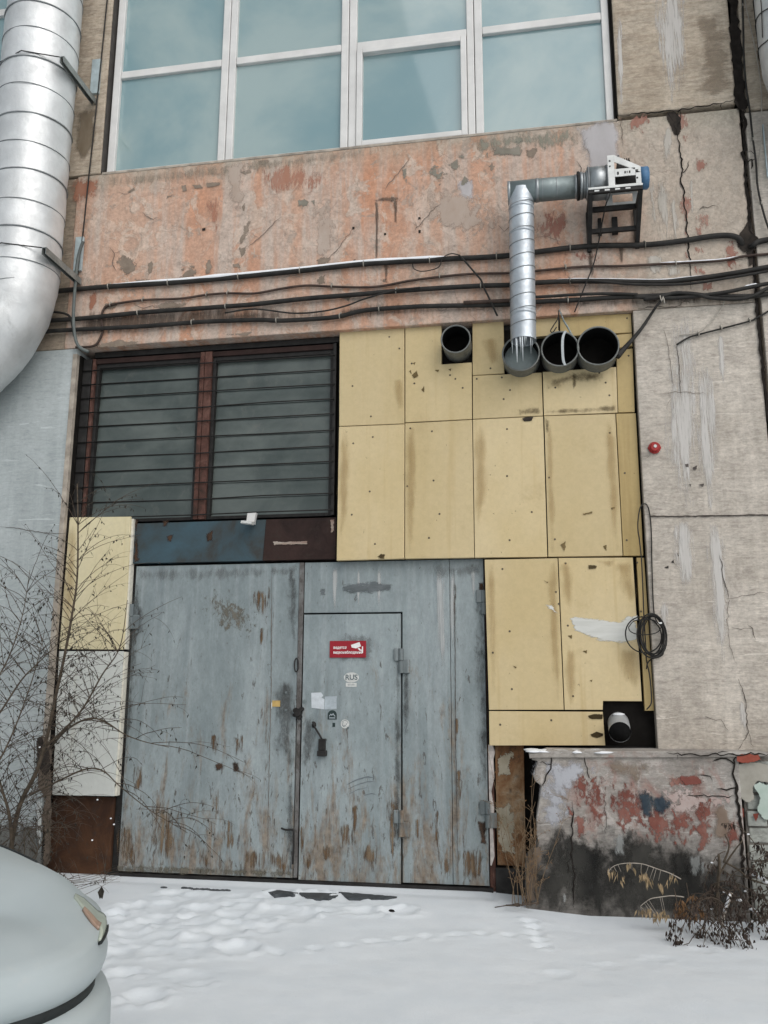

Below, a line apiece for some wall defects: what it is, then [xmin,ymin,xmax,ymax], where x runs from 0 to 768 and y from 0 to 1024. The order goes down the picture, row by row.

peeling [241,160,321,207]
flaking render [117,255,153,287]
flaking render [233,204,251,268]
crack [620,100,754,405]
water stain [667,324,725,507]
corrosion [211,735,243,772]
crack [669,559,767,890]
corrosion [244,851,289,871]
corrosion [317,806,377,864]
crack [567,803,575,907]
water stain [526,829,743,917]
peeling [541,754,768,851]